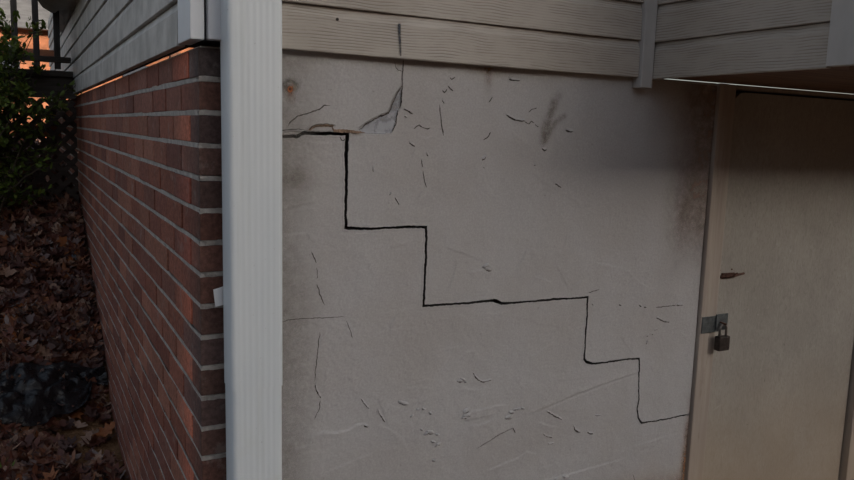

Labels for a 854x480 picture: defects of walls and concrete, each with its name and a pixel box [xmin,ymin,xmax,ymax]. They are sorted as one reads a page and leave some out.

flaking render [282,61,413,141]
crack [282,105,689,426]